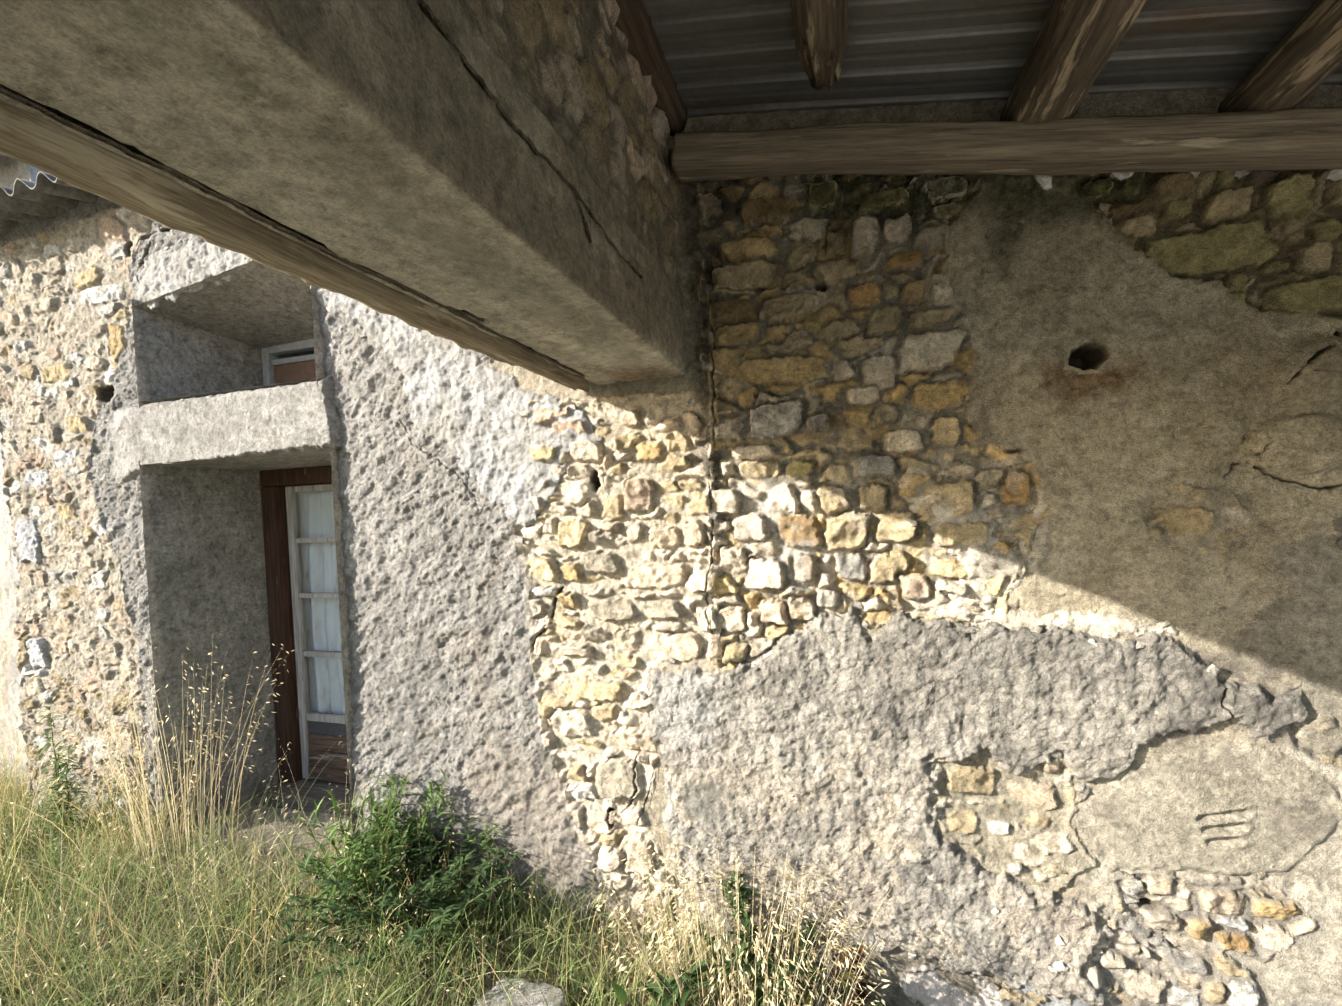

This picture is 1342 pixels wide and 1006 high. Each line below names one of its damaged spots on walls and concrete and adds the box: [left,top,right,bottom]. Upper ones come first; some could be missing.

crack [418,2,644,279]
crack [0,84,585,377]
spalling [1072,169,1342,324]
crack [1279,309,1342,391]
spalling [0,206,256,837]
spalling [310,174,1179,962]
crack [1218,434,1342,496]
spalling [1286,716,1342,769]
peeling [900,952,1048,1006]
spalling [1048,870,1317,1006]